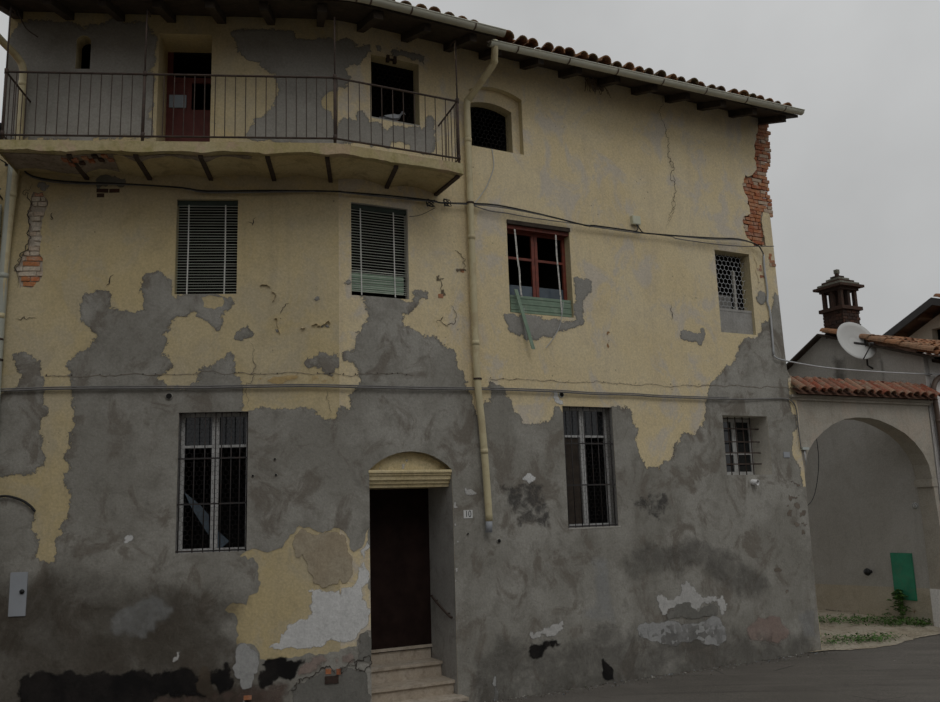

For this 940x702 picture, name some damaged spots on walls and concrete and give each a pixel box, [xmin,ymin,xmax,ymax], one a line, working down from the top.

flaking render [4,18,158,141]
flaking render [230,28,436,155]
crack [659,104,677,224]
flaking render [0,124,822,702]
damp [0,577,354,702]